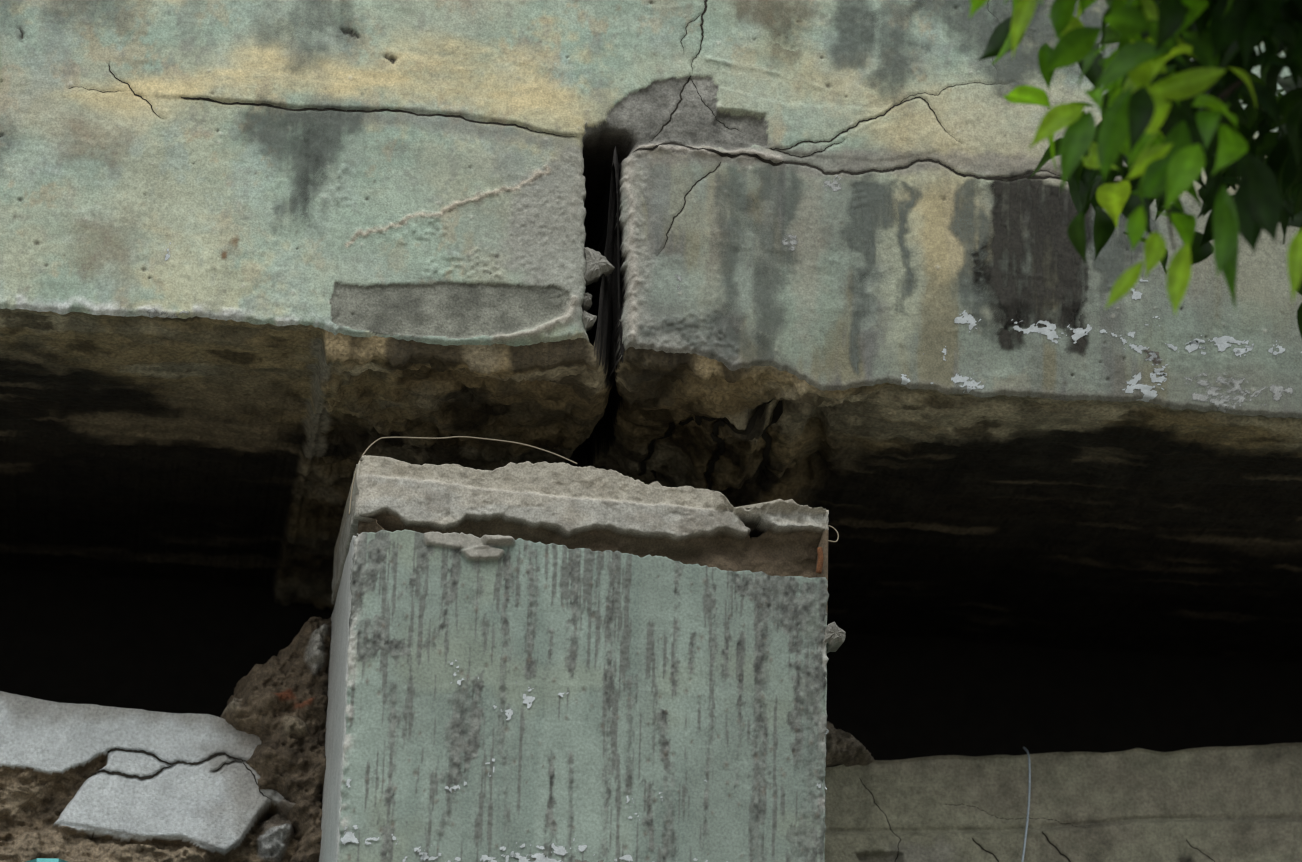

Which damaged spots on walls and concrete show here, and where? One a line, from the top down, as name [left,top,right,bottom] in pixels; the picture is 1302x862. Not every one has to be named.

crack [69,65,576,137]
spalling [330,282,574,338]
crack [567,0,1068,467]
peeling [954,310,981,332]
leakage [951,170,1156,354]
peeling [1011,279,1302,402]
peeling [1186,373,1293,413]
crack [638,399,783,490]
crack [357,511,828,613]
peeling [340,533,677,862]
peeling [693,571,829,862]
crack [88,748,272,800]